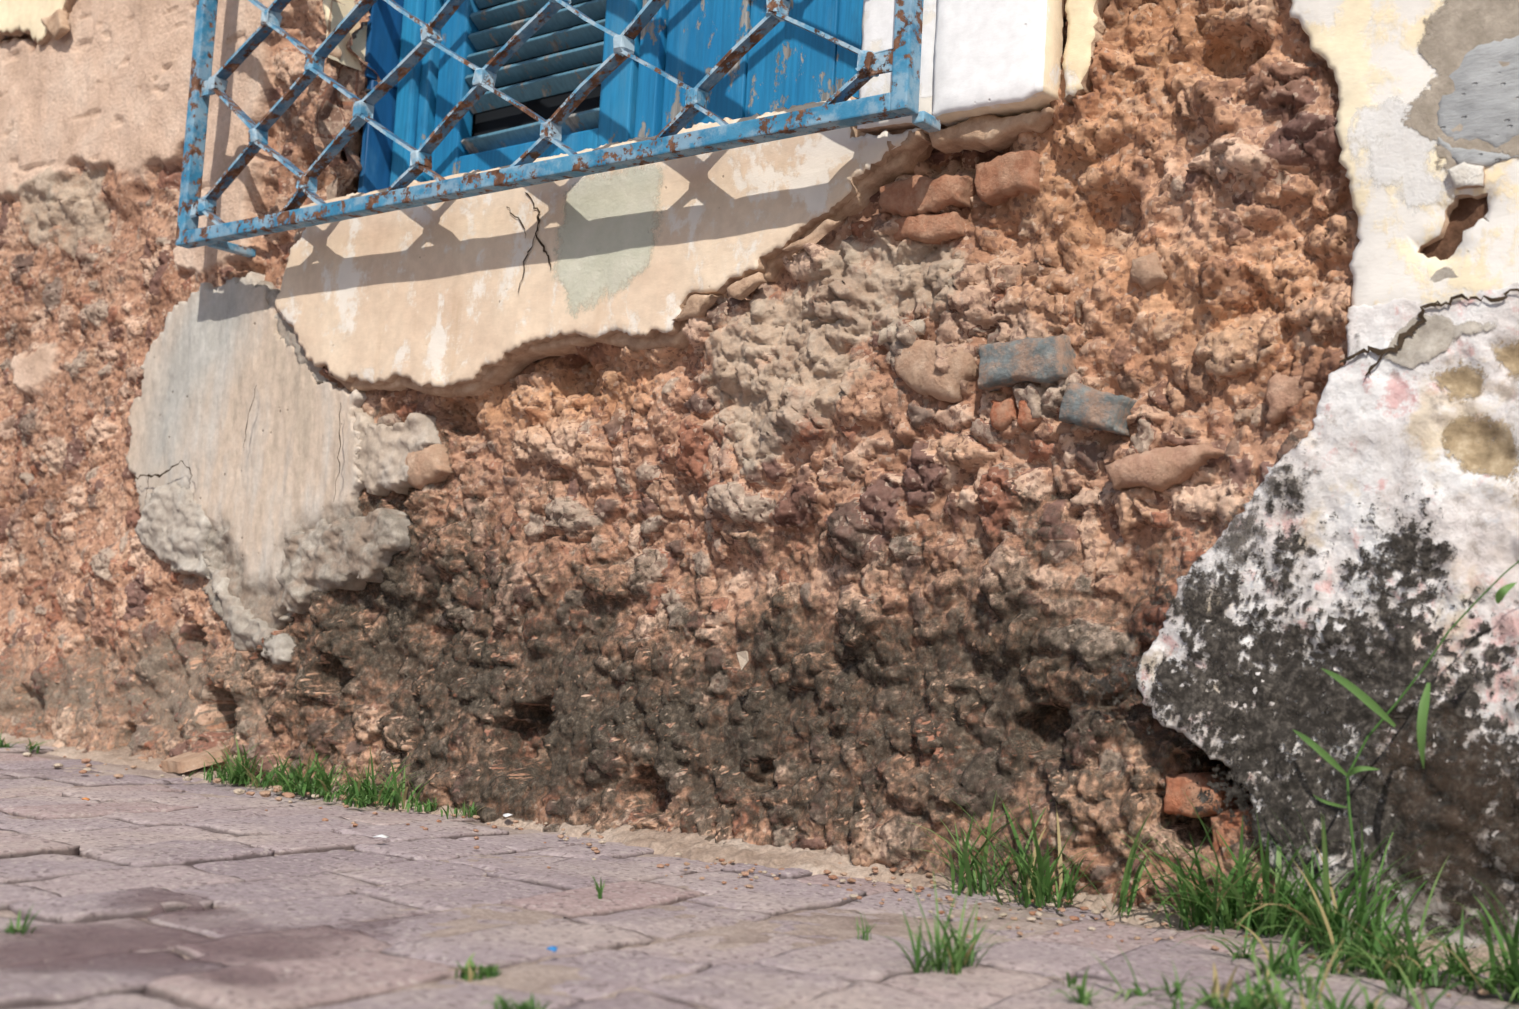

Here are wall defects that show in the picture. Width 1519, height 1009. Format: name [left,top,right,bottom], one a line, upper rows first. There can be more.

peeling [1348,0,1519,208]
spalling [0,0,306,758]
crack [506,192,551,292]
spalling [153,0,1360,919]
crack [1339,288,1519,377]
flaking render [1421,197,1489,283]
leakage [0,426,1519,949]
leakage [0,892,301,979]